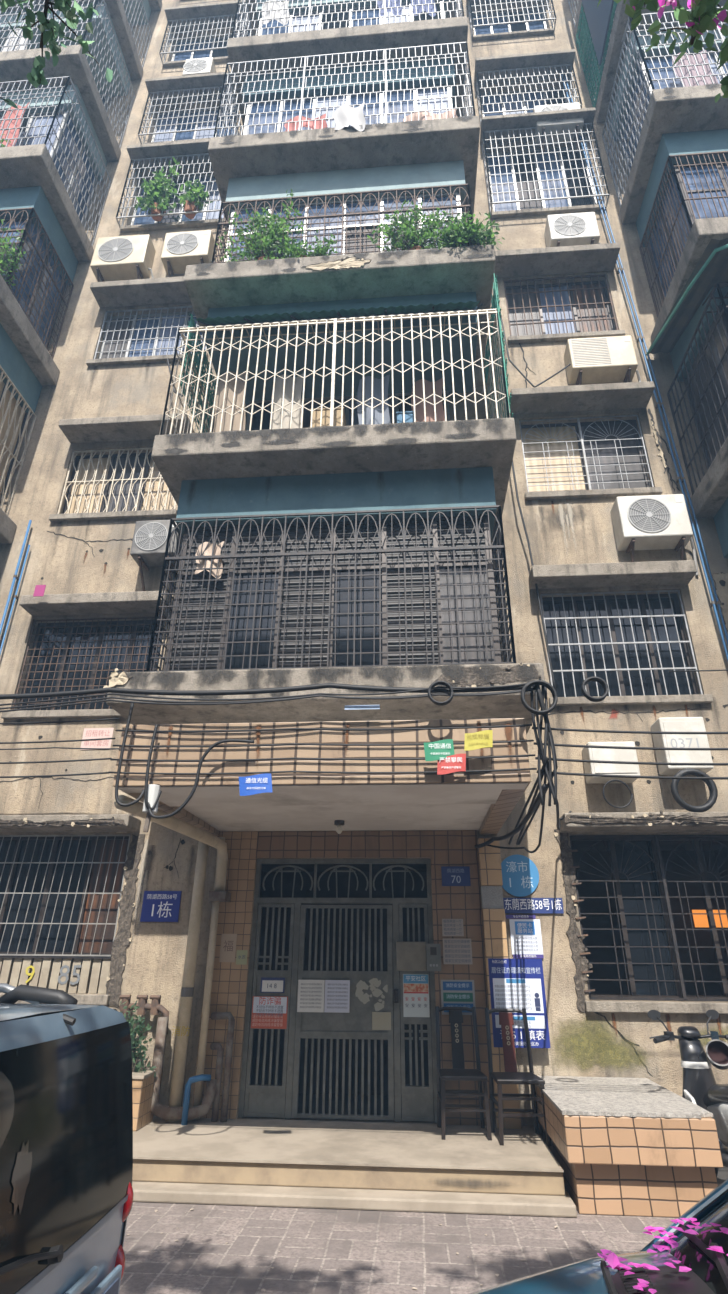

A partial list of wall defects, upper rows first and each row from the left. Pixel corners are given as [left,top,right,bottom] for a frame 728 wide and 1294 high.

spalling [0,817,151,1007]
spalling [554,810,728,1013]